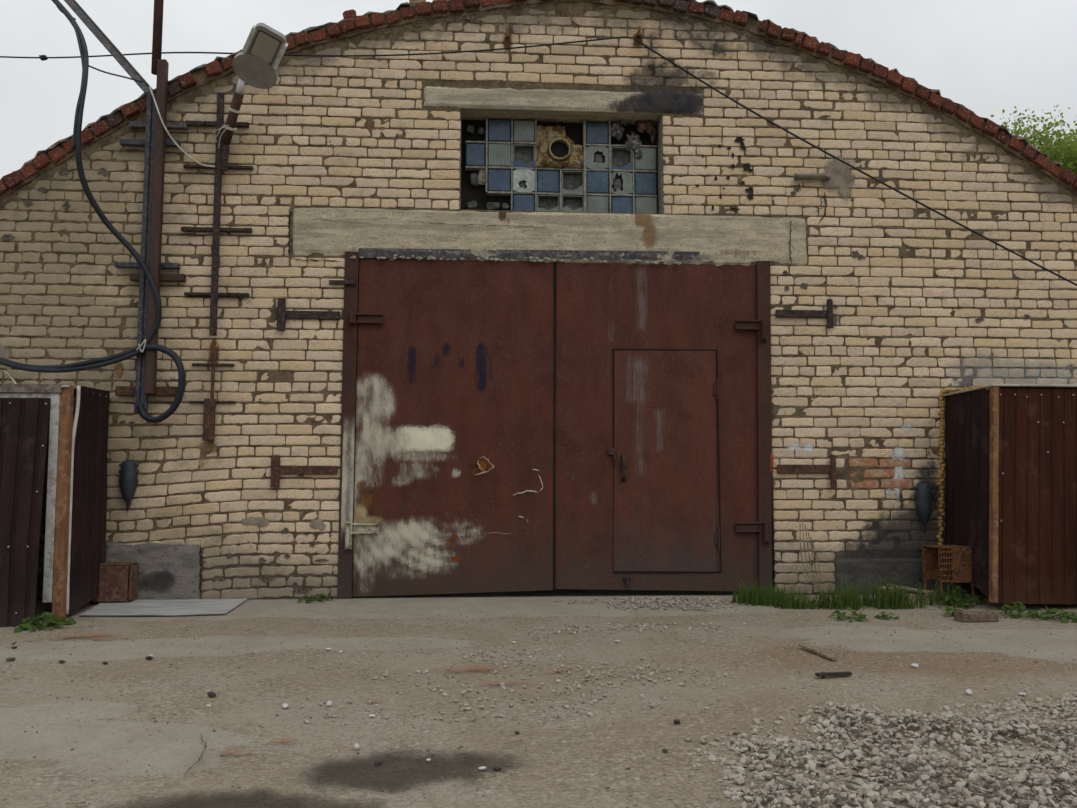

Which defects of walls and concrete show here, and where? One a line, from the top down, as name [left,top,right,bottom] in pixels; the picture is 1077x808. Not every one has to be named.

rust [635,214,655,246]
rust [209,339,219,363]
peeling [471,456,495,475]
rust [354,481,382,523]